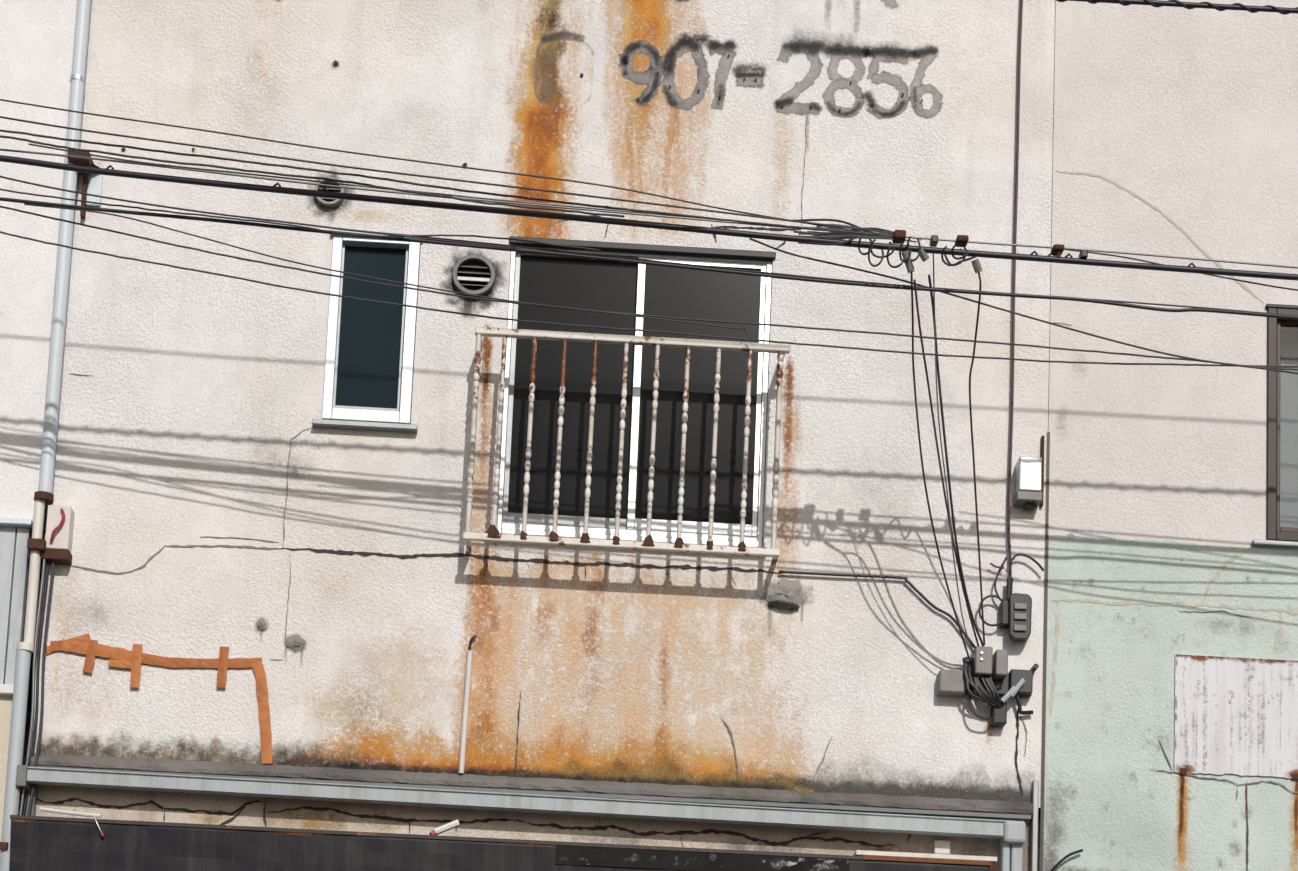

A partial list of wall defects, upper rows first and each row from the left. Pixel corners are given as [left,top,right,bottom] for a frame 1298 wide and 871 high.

corrosion [512,1,578,238]
corrosion [606,0,708,222]
crack [711,114,807,248]
crack [1057,171,1264,304]
crack [70,428,779,660]
corrosion [277,337,807,790]
crack [1015,547,1298,799]
corrosion [1176,654,1298,665]
crack [37,798,911,847]
corrosion [1176,765,1193,871]
corrosion [1289,770,1298,870]